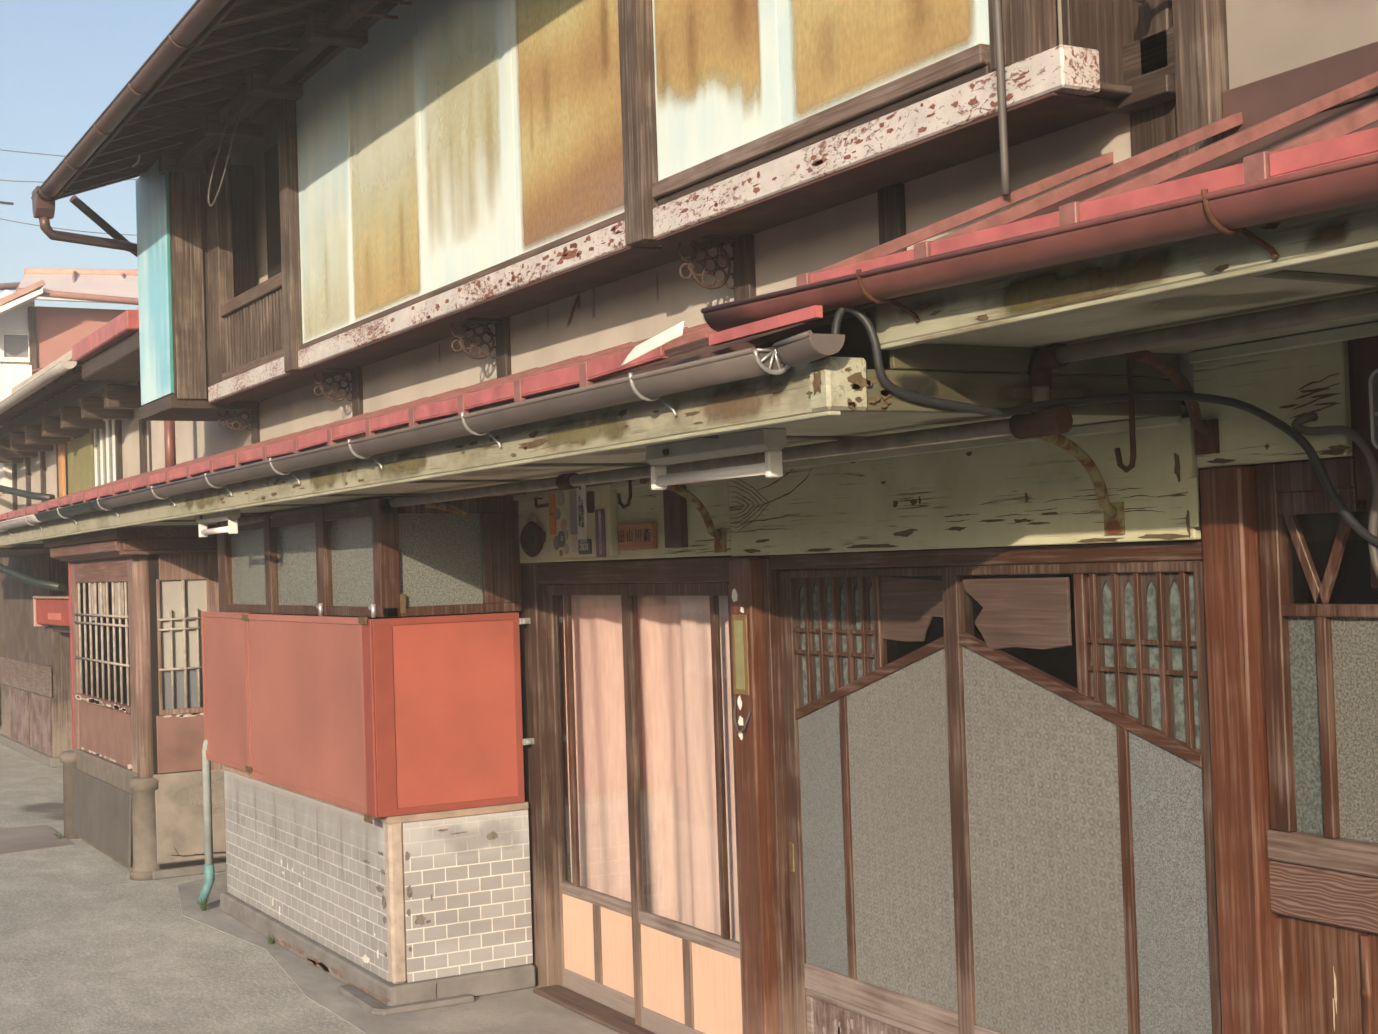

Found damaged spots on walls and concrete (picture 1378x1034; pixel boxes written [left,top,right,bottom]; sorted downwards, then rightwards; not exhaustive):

water stain [1000,252,1169,314]
water stain [1151,293,1299,310]
peeling [808,529,918,552]
peeling [946,493,1058,531]
peeling [1077,510,1191,543]